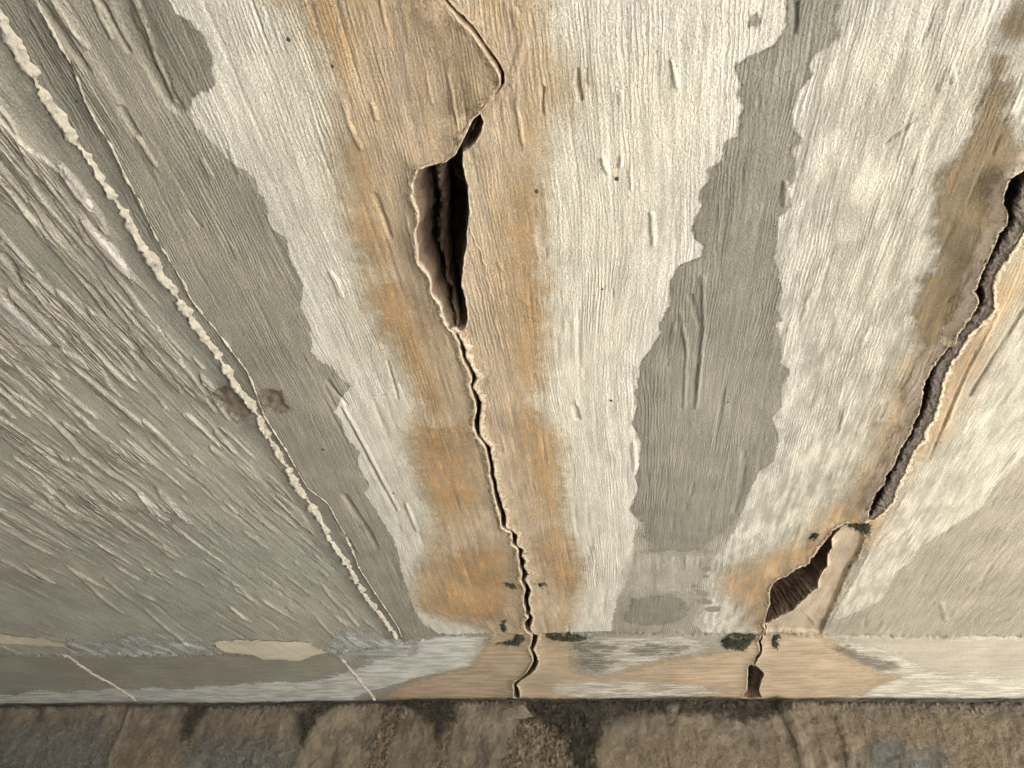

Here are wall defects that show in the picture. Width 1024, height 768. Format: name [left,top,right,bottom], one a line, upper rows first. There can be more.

water stain [0,0,489,705]
crack [405,0,542,699]
corrosion [303,0,896,701]
water stain [515,0,1024,701]
crack [741,166,1024,699]